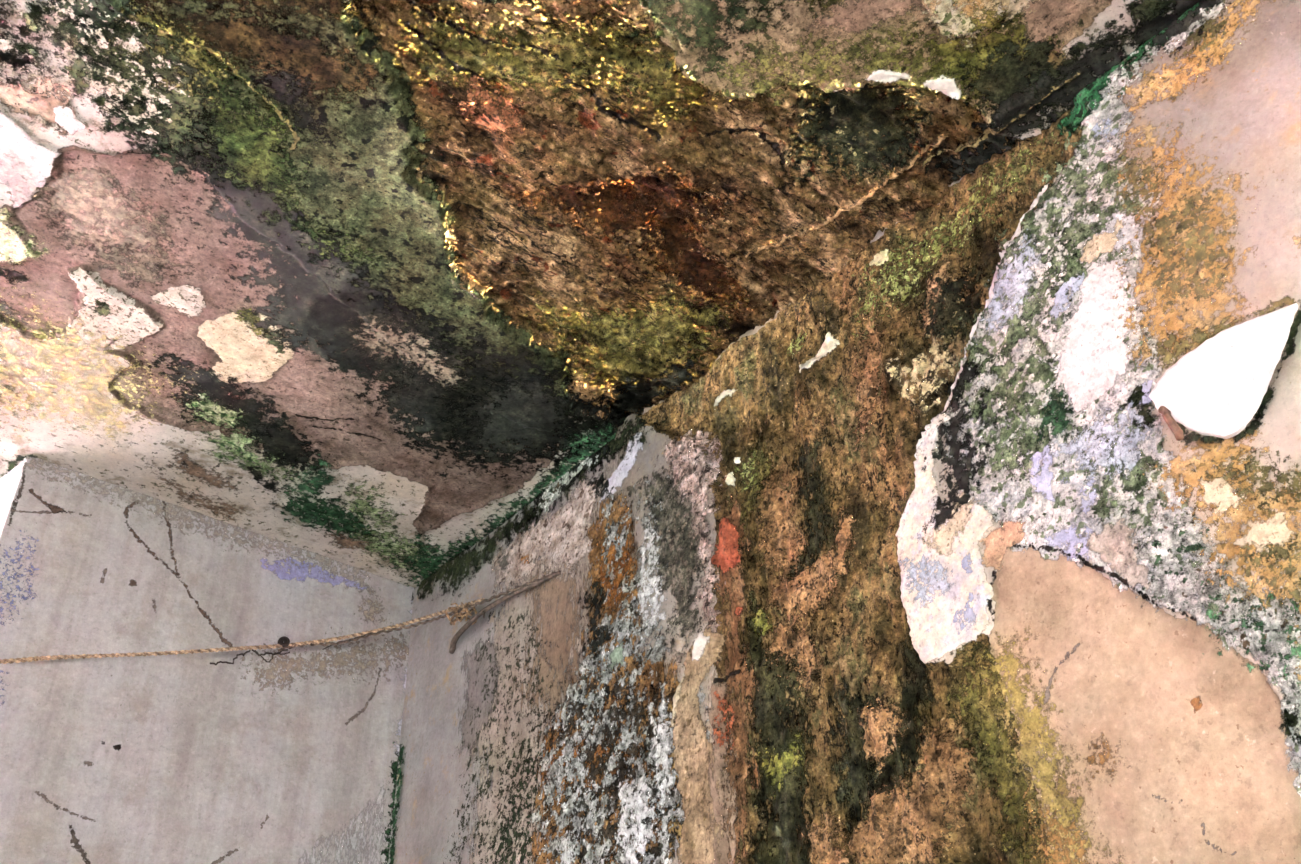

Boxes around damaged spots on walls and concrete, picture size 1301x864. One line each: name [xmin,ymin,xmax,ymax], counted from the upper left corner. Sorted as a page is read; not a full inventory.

crack [8,468,92,526]
damp [0,0,726,864]
spalling [346,0,1301,864]
crack [123,500,233,647]
crack [35,791,95,864]
crack [212,849,238,864]